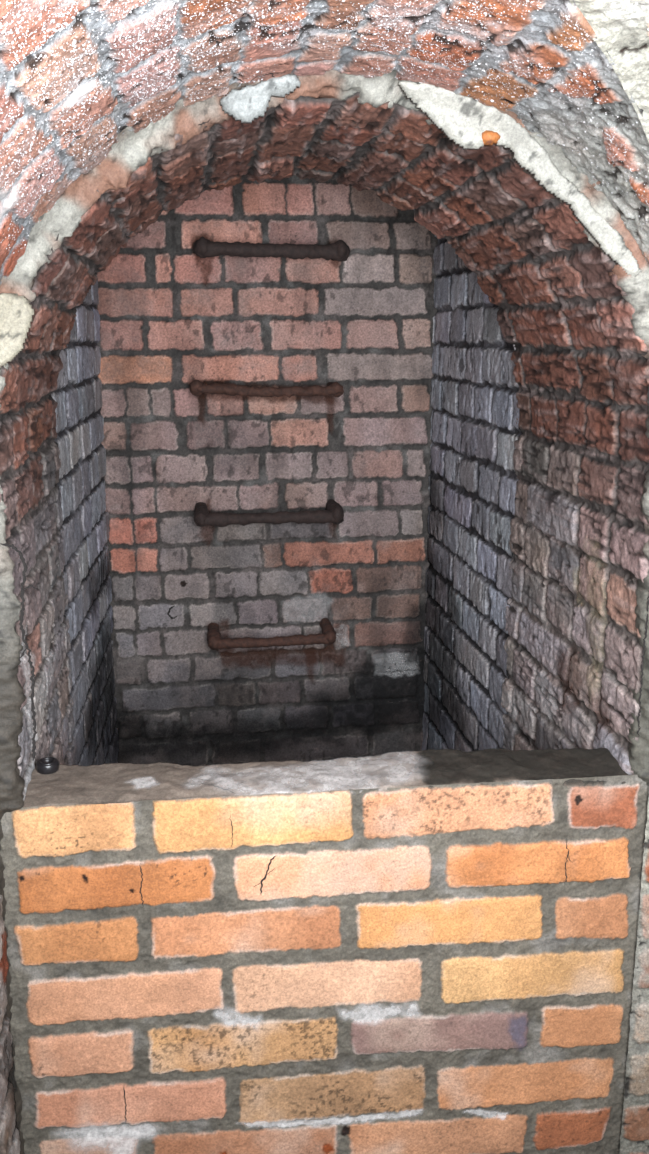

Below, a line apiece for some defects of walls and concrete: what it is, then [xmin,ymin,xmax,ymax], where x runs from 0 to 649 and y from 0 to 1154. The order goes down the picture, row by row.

peeling [0,293,35,368]
crack [637,596,649,737]
damp [116,713,329,755]
crack [254,856,276,894]